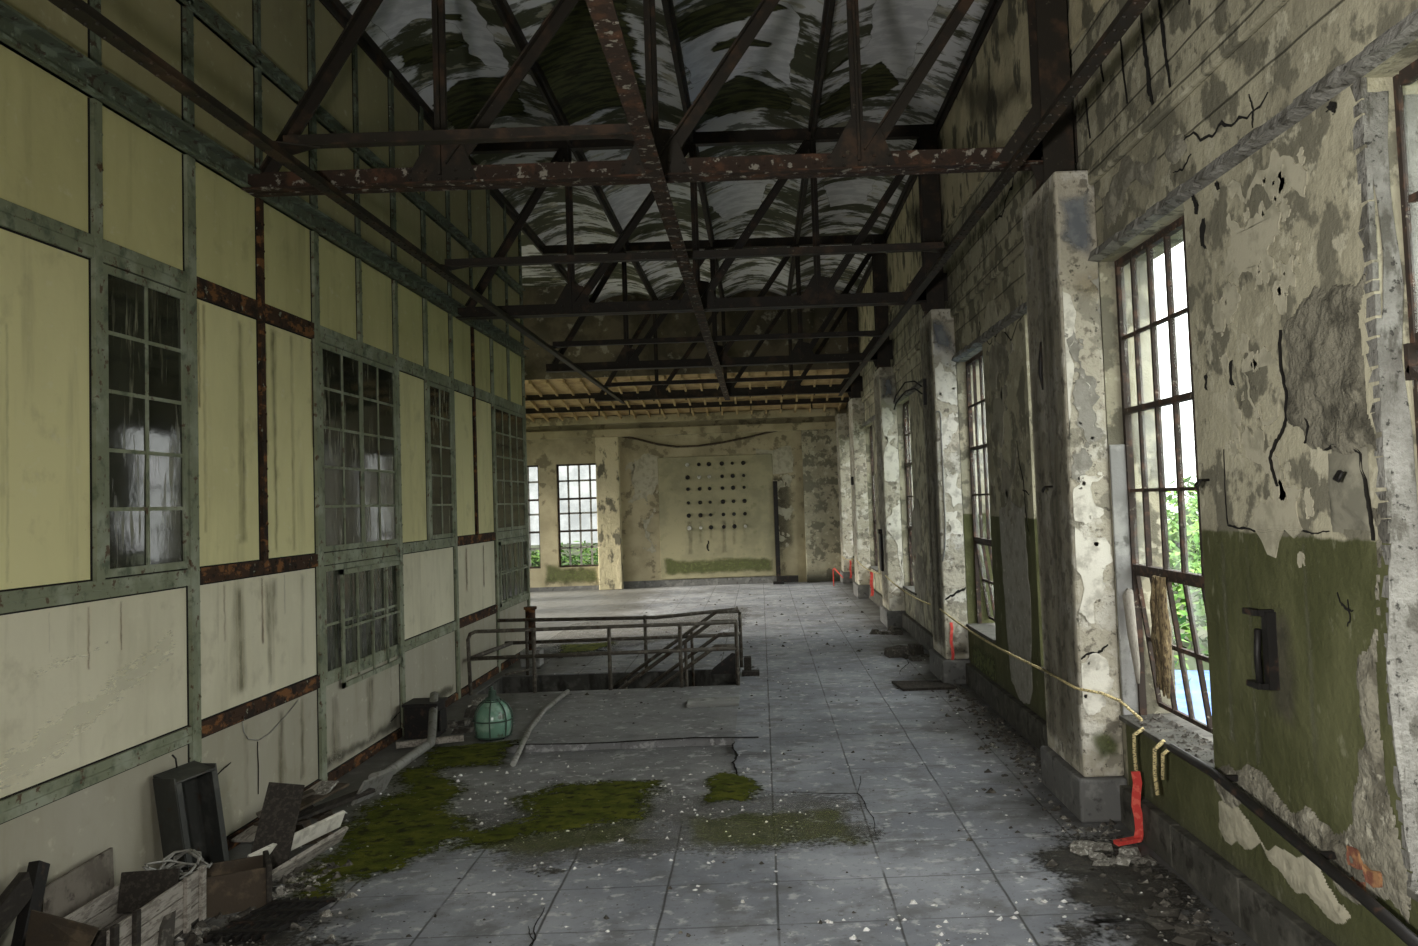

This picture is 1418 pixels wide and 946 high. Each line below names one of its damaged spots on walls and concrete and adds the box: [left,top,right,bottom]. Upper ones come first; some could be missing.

crack [1173,92,1268,173]
flaking render [1204,77,1418,925]
crack [1268,330,1375,541]
leakage [1276,622,1292,719]